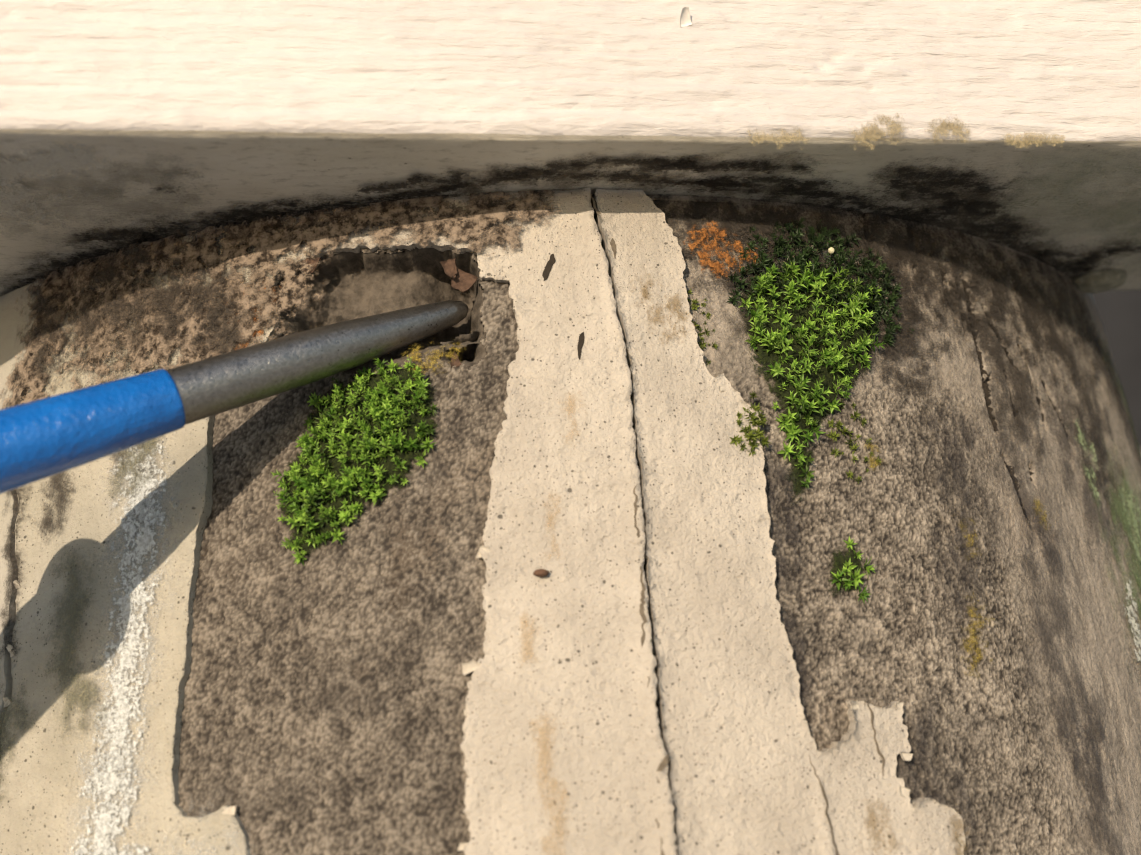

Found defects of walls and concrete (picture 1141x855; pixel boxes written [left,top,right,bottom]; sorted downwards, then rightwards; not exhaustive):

leakage [0,472,73,654]
leakage [48,439,167,855]
peeling [178,248,519,855]
leakage [0,130,1141,559]
crack [577,332,585,360]
crack [591,194,616,276]
crack [630,396,670,783]
crack [809,756,840,855]
peeling [646,195,1141,855]
leakage [1121,580,1141,661]